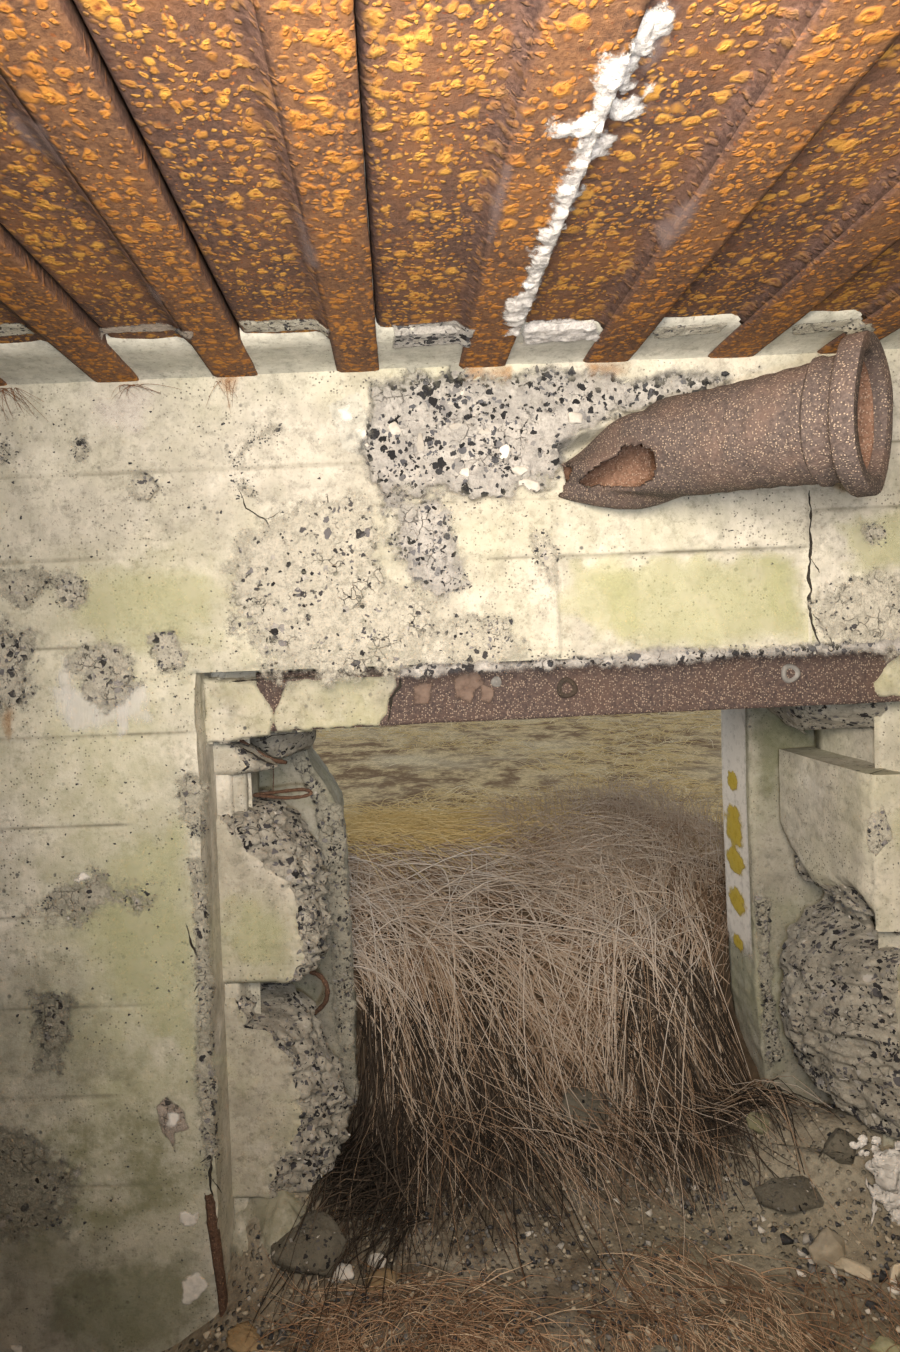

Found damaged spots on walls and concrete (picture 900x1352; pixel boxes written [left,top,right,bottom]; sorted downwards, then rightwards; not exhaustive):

water stain [502,1,675,345]
spalling [393,321,475,348]
spalling [653,323,727,339]
spalling [792,318,875,335]
spalling [210,364,900,685]
spalling [0,545,98,723]
rust [414,683,432,705]
rust [454,671,494,704]
spalling [273,750,359,1178]
spalling [754,894,797,1068]